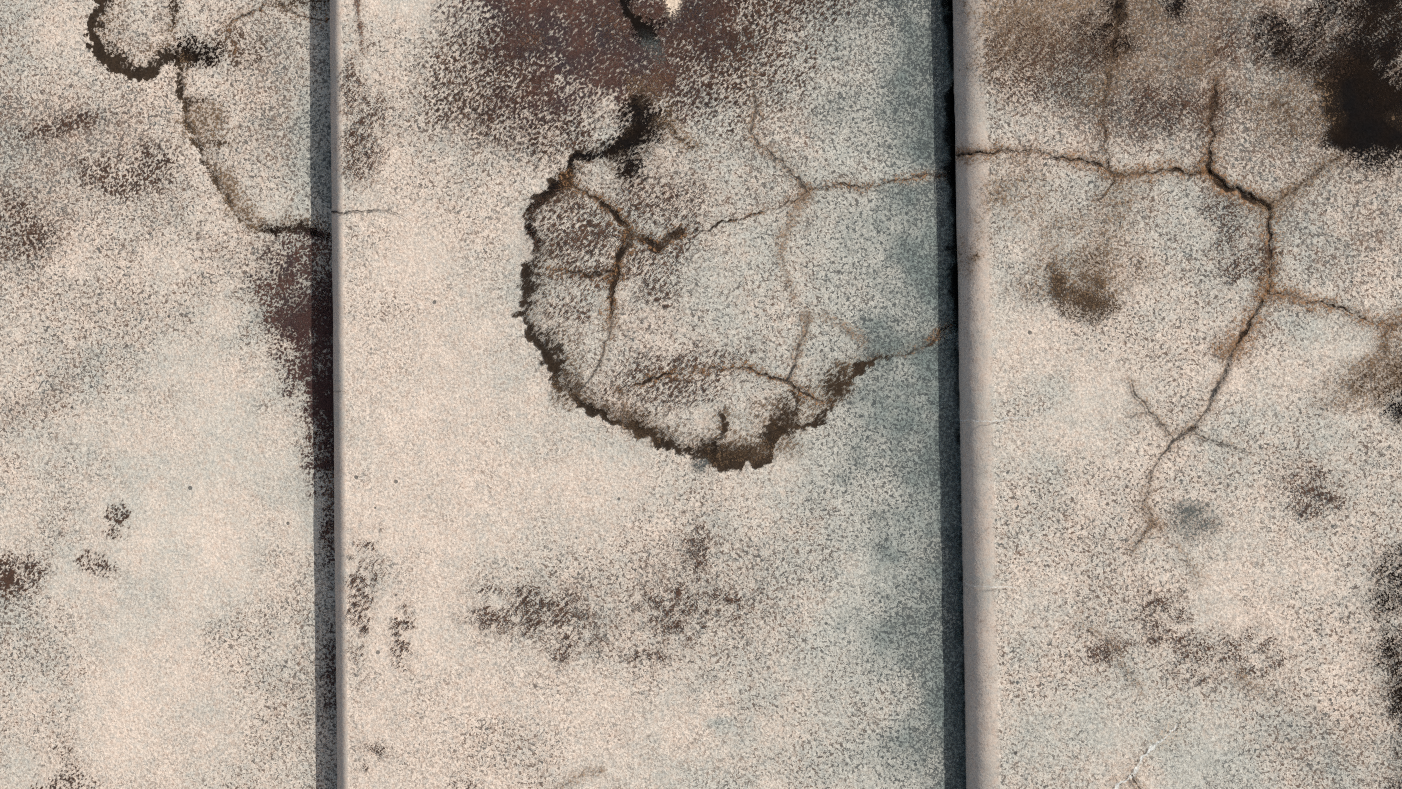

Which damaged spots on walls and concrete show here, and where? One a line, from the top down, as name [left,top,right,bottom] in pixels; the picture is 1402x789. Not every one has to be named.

crack [222,0,330,53]
crack [174,54,404,240]
leakage [512,0,889,472]
crack [546,0,1402,582]
leakage [937,0,1402,789]